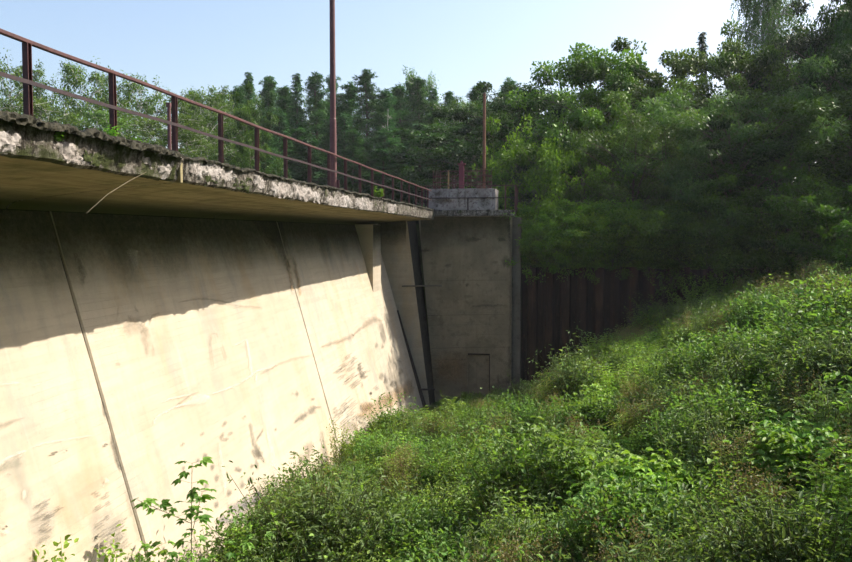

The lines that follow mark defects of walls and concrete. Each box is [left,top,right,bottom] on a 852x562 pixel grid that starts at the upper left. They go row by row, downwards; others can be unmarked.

spalling [0,130,24,154]
spalling [53,140,85,165]
spalling [142,156,174,179]
spalling [188,160,237,183]